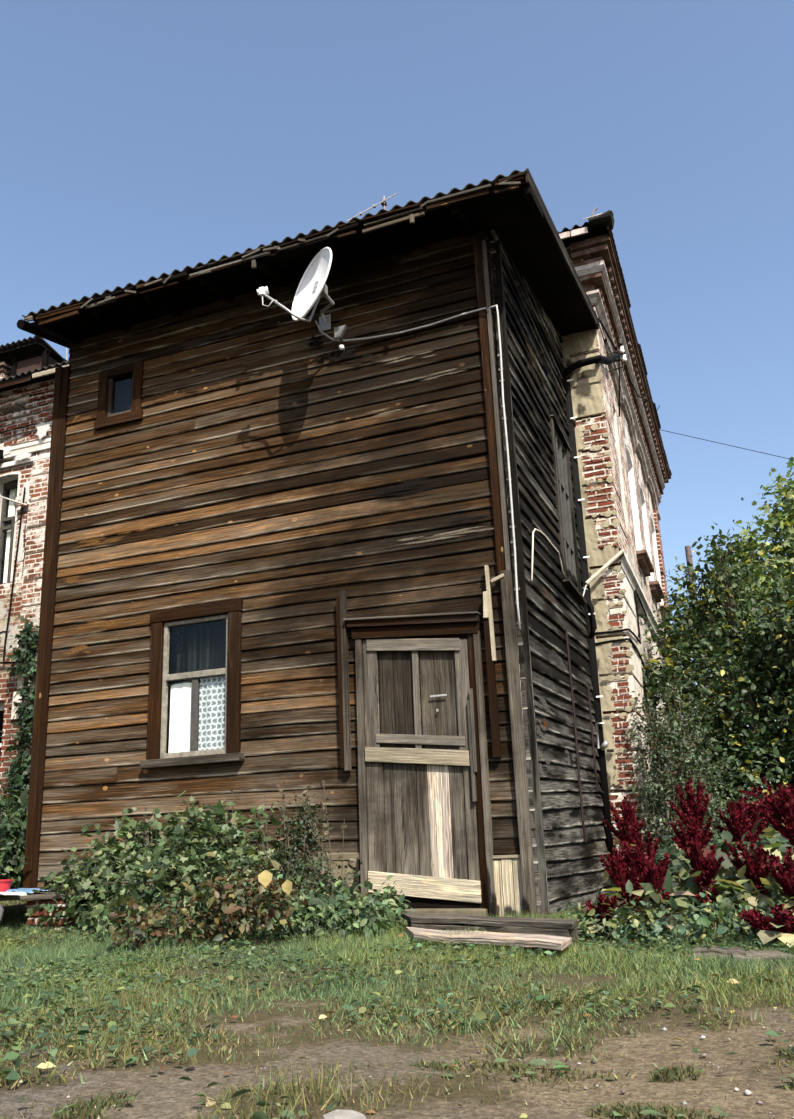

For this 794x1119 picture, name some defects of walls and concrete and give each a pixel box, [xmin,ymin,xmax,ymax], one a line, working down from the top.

water stain [307,335,432,363]
peeling [0,446,31,460]
peeling [36,422,50,439]
peeling [15,479,30,562]
flaking render [0,600,20,654]
flaking render [581,424,660,854]